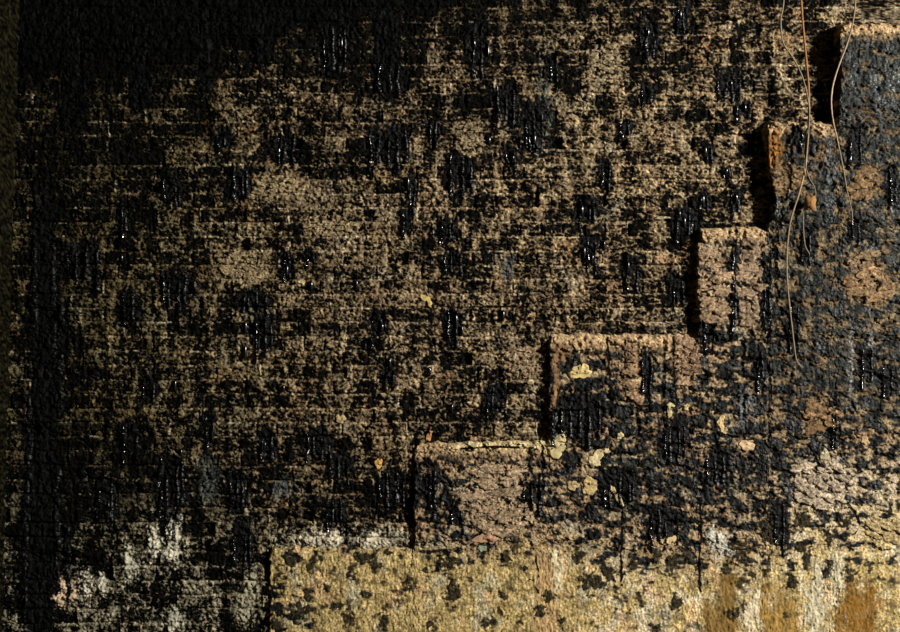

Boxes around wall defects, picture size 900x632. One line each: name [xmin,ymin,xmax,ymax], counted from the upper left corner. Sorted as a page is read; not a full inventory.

leakage [315,7,355,77]
spalling [692,232,769,327]
flaking render [567,363,592,379]
spalling [615,344,644,407]
spalling [670,334,705,388]
leakage [551,402,601,452]
flaking render [666,402,690,418]
spalling [456,450,539,552]